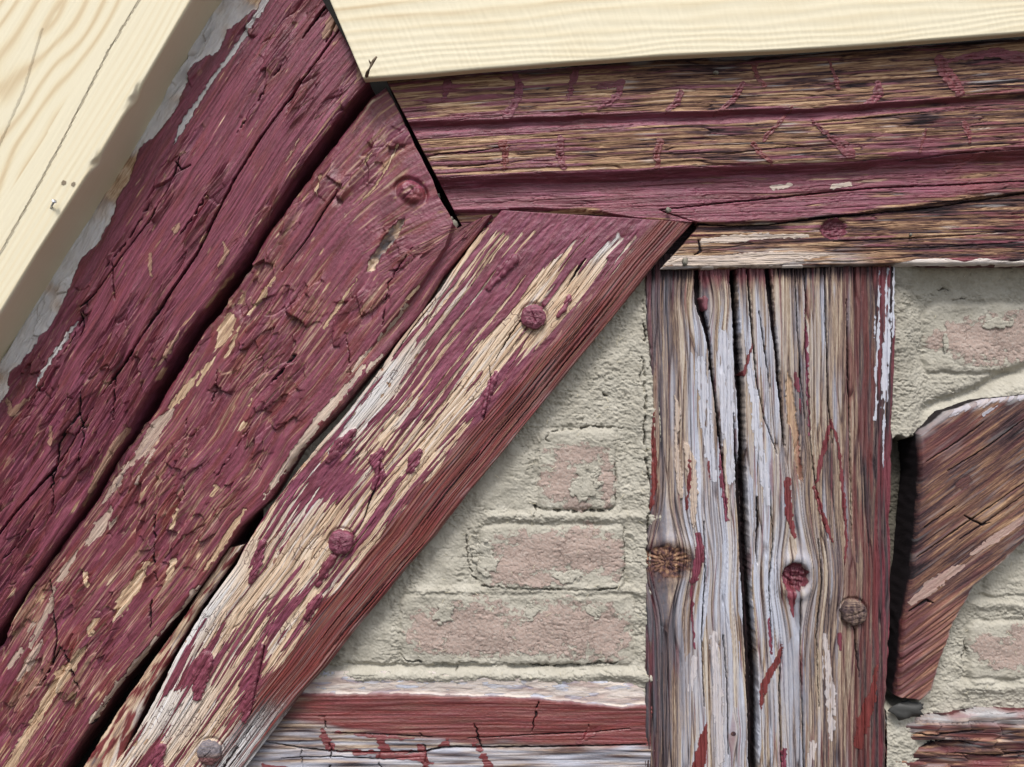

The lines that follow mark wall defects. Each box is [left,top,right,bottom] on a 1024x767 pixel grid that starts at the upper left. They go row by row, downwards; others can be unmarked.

peeling [359,143,399,204]
crack [0,0,339,557]
peeling [7,276,276,682]
peeling [113,218,636,767]
crack [322,290,624,660]
peeling [674,395,699,528]
peeling [785,370,803,482]
crack [661,181,1024,767]
crack [44,584,78,686]
peeling [89,585,201,723]
crack [150,515,158,627]
crack [223,702,644,767]